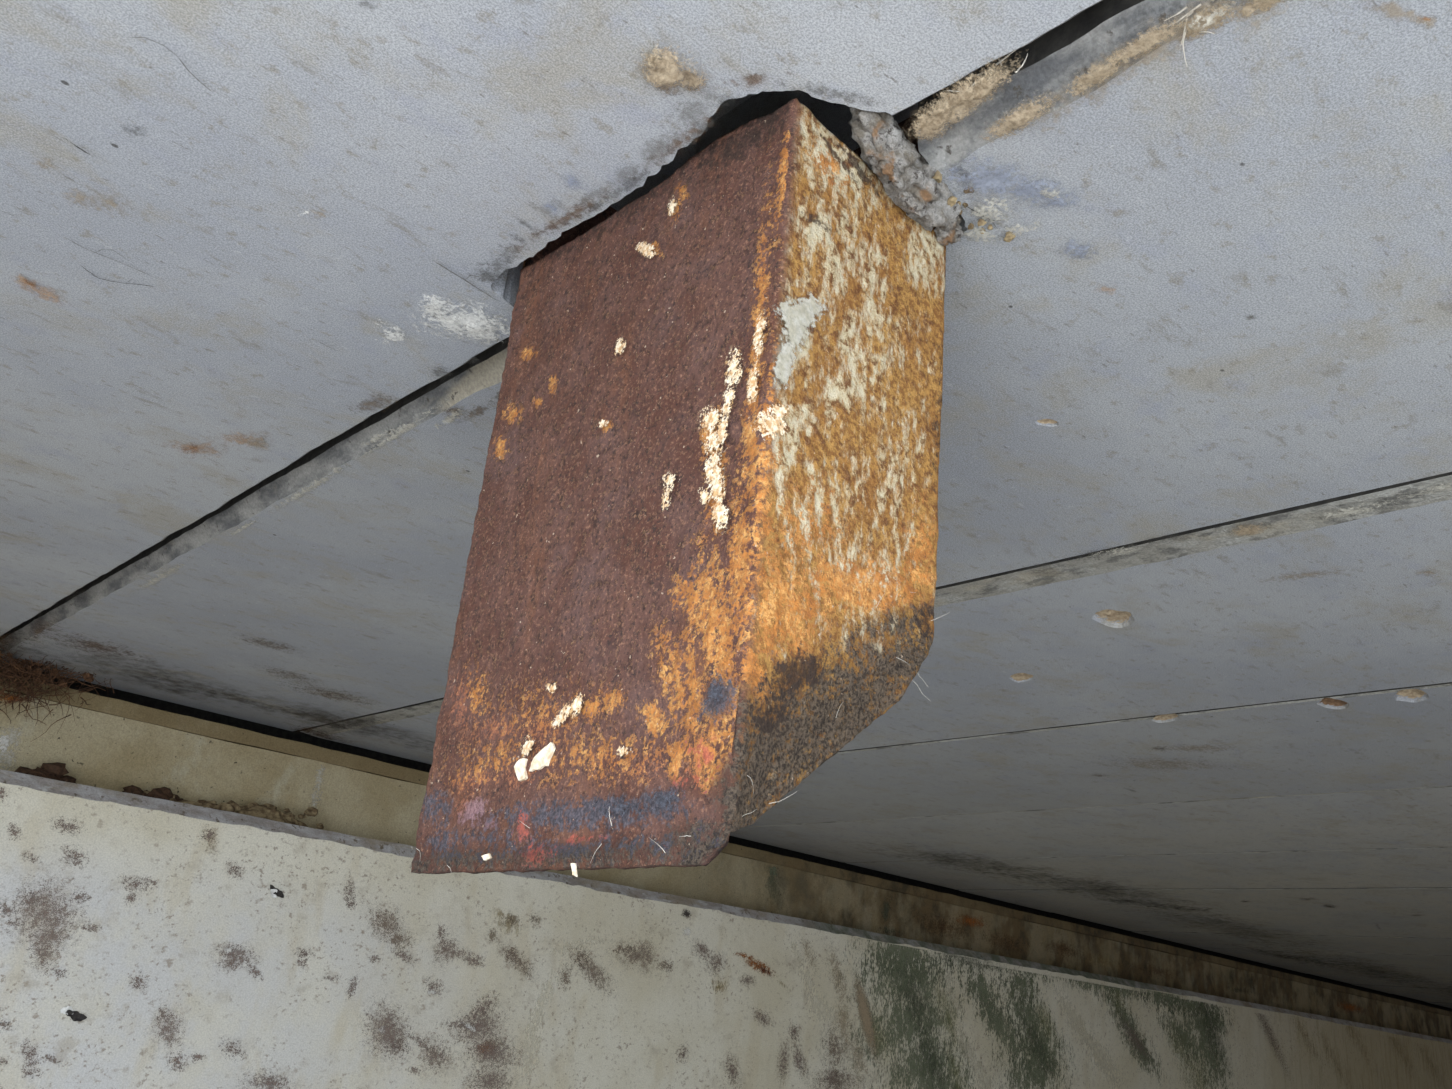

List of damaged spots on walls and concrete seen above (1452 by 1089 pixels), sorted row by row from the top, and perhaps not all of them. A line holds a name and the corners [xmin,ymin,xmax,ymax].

rust [533,202,593,235]
water stain [0,819,102,978]
water stain [120,875,156,904]
water stain [344,875,417,964]
water stain [217,944,262,980]
water stain [613,942,673,973]
water stain [362,916,613,1089]
water stain [0,1020,60,1079]
water stain [153,1005,245,1071]
water stain [243,1069,290,1089]